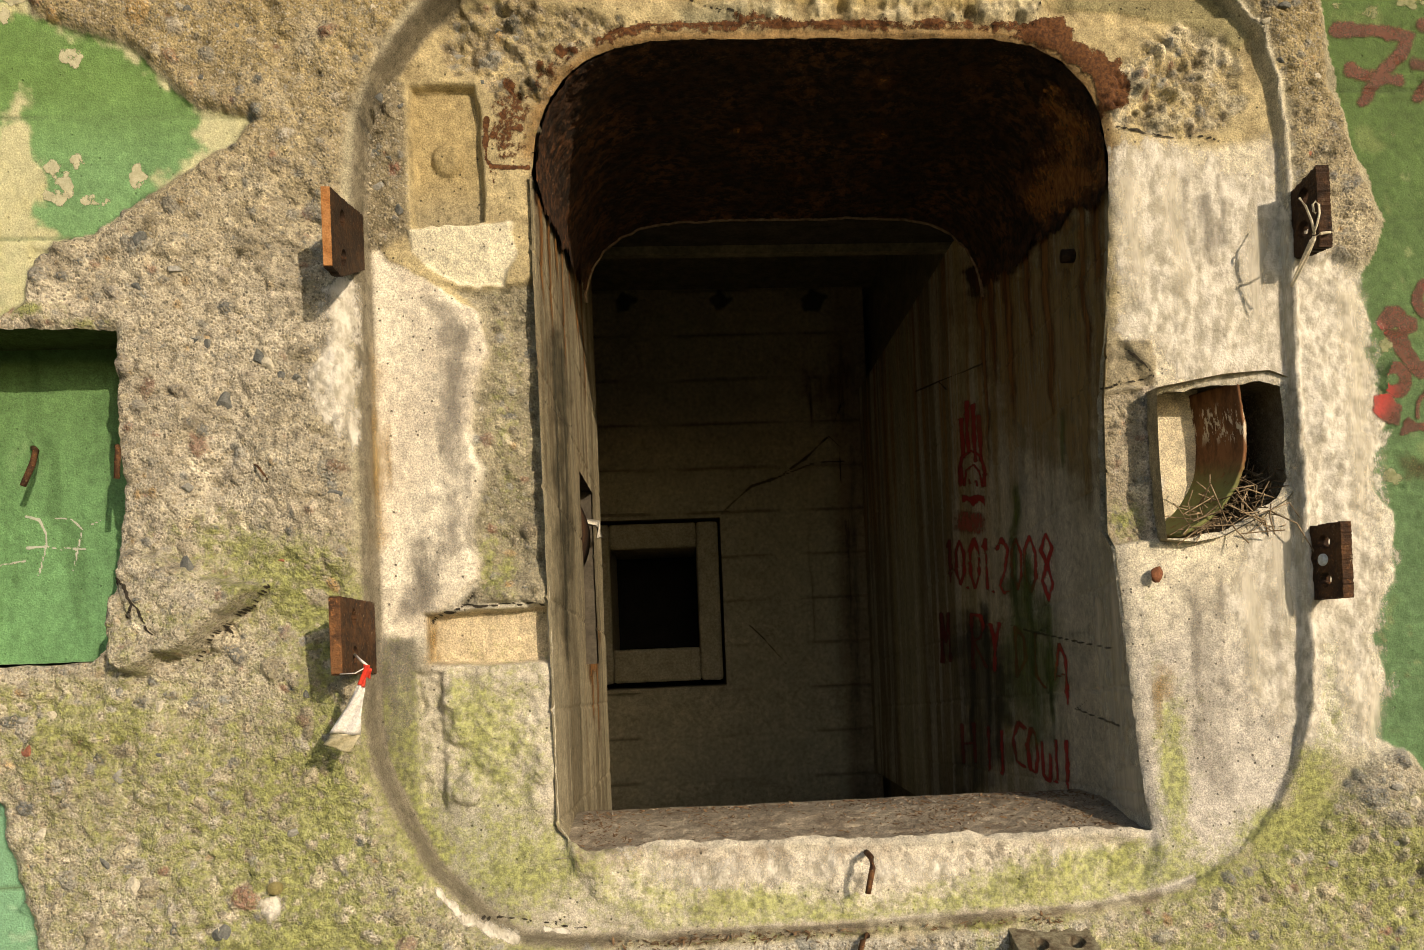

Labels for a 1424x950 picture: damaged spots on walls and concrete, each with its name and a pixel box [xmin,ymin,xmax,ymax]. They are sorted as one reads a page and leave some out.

spalling [438,0,625,107]
spalling [1110,22,1248,139]
peeling [1396,0,1424,10]
spalling [1243,0,1379,274]
rust [482,9,1132,450]
leakage [307,276,378,482]
peeling [1379,337,1393,352]
spalling [0,0,551,950]
crack [725,404,844,510]
leakage [259,896,281,922]
leakage [435,888,520,944]
leakage [543,926,571,934]